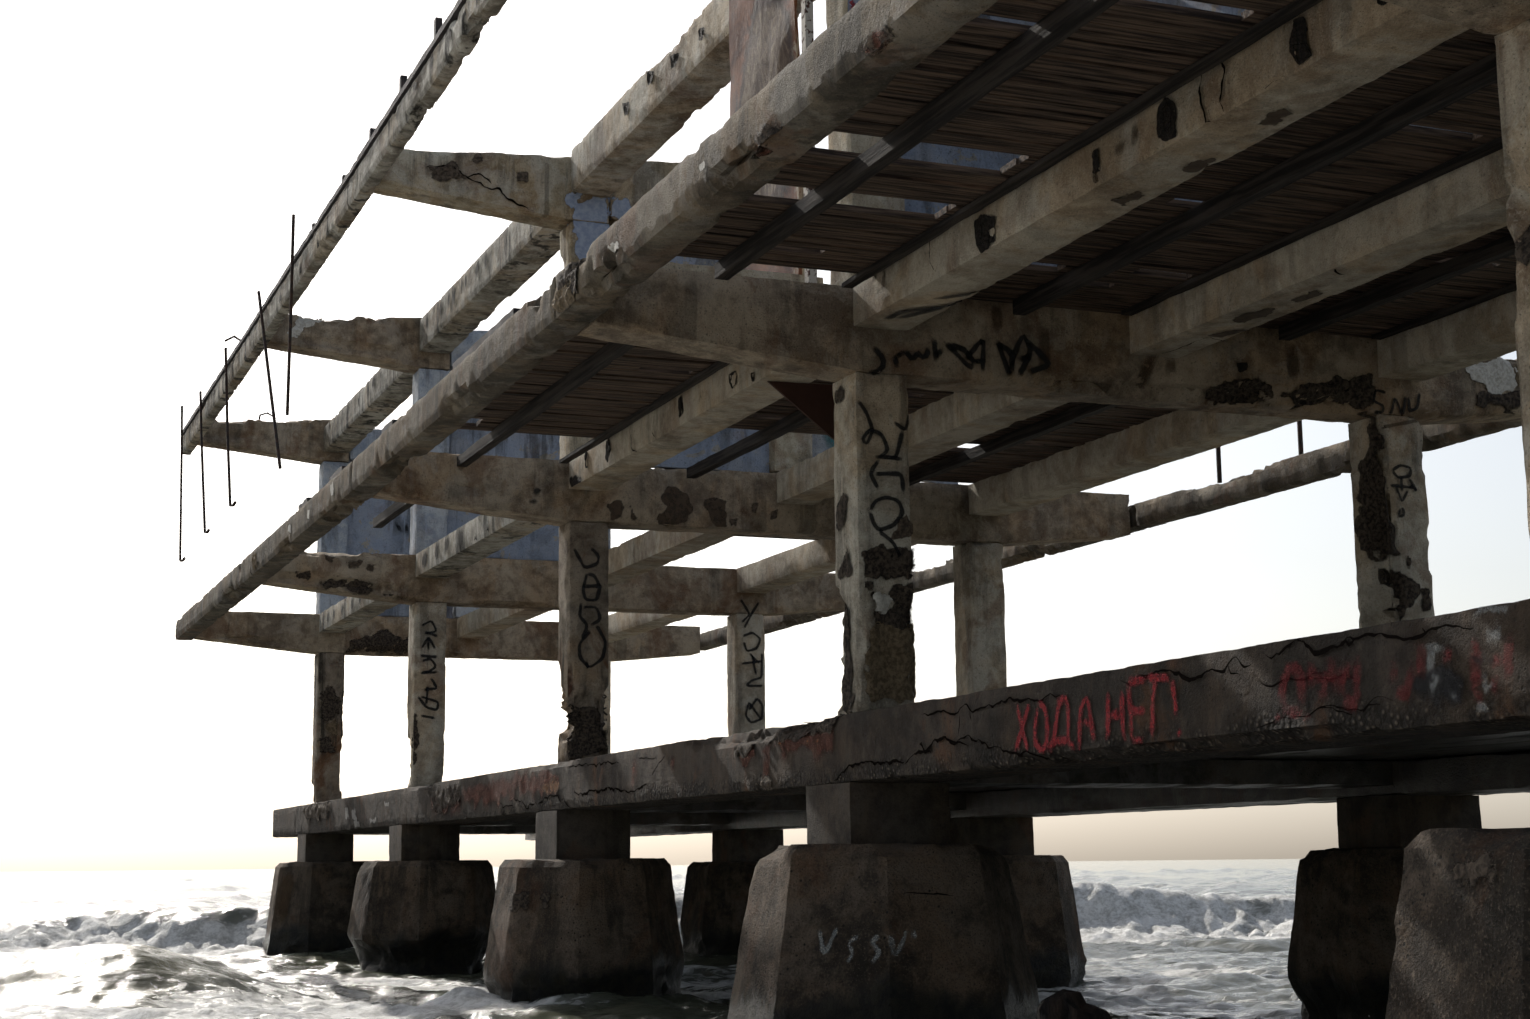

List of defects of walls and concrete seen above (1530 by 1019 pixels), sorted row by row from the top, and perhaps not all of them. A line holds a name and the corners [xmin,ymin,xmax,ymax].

spalling [864,26,893,53]
crack [426,165,533,211]
peeling [551,192,632,312]
spalling [834,386,844,404]
spalling [1466,356,1521,415]
spalling [836,493,847,531]
spalling [1205,373,1432,621]
spalling [733,515,916,759]
crack [1120,624,1473,728]
spalling [566,705,608,760]
crack [834,693,1062,781]
corrosion [463,771,559,808]